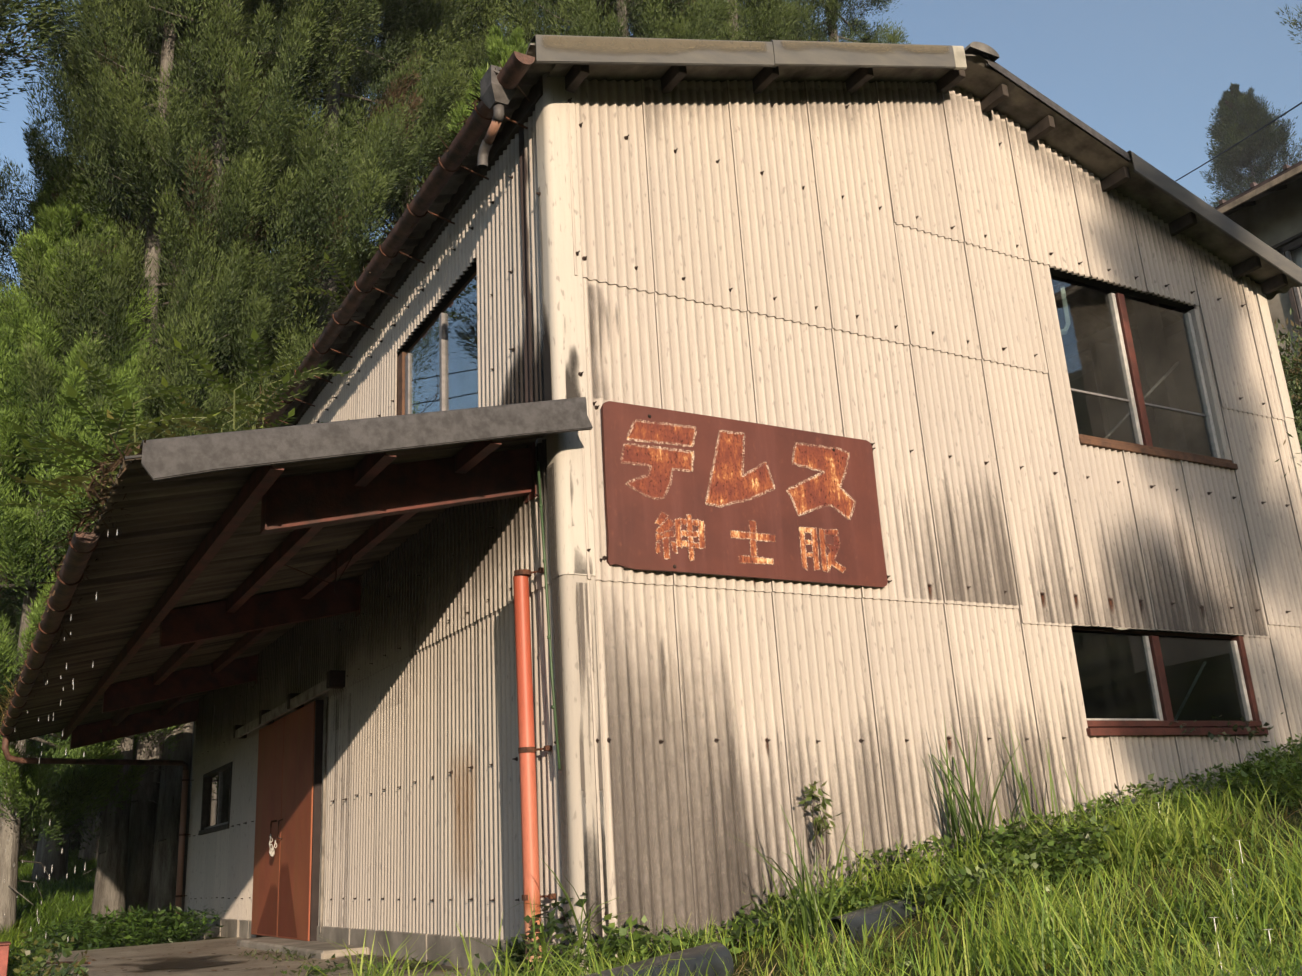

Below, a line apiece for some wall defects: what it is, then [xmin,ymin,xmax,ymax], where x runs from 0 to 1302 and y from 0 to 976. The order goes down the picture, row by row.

leakage [503,127,618,405]
leakage [918,494,1017,606]
leakage [1034,514,1267,636]
leakage [546,463,794,972]
leakage [800,709,1093,891]